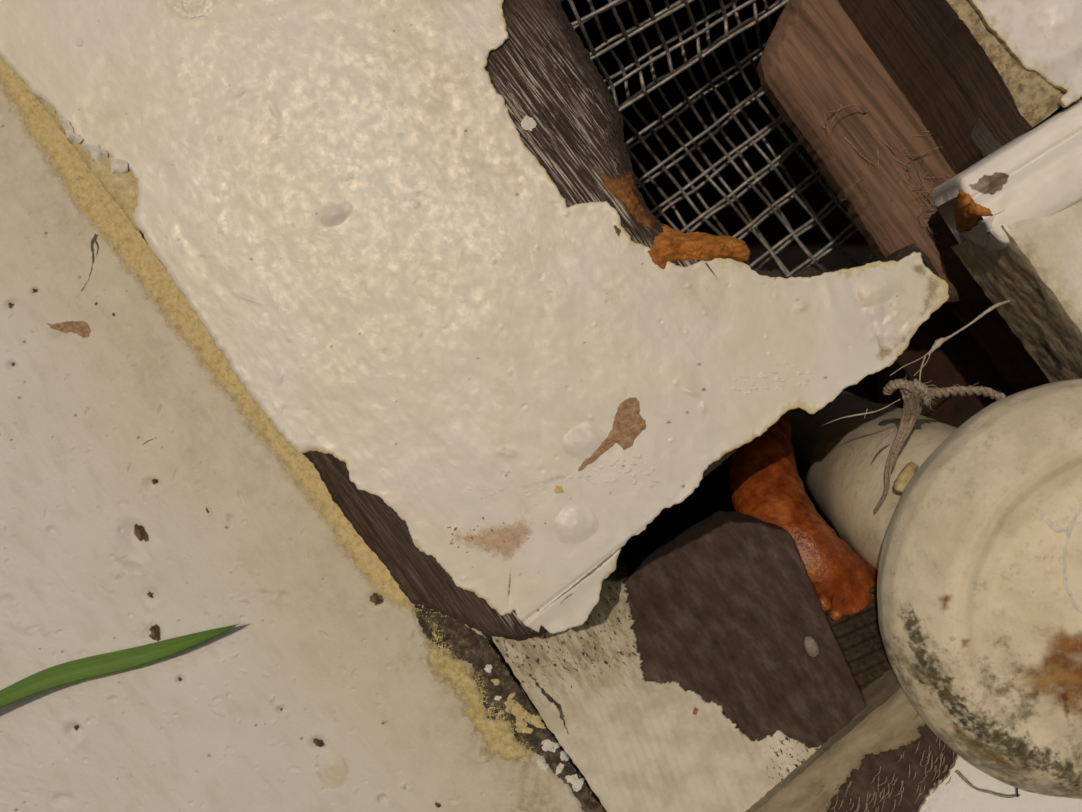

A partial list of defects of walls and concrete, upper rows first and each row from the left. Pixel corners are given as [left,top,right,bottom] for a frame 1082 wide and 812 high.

peeling [37,97,140,233]
spalling [561,0,877,275]
spalling [842,374,871,399]
spalling [370,593,384,605]